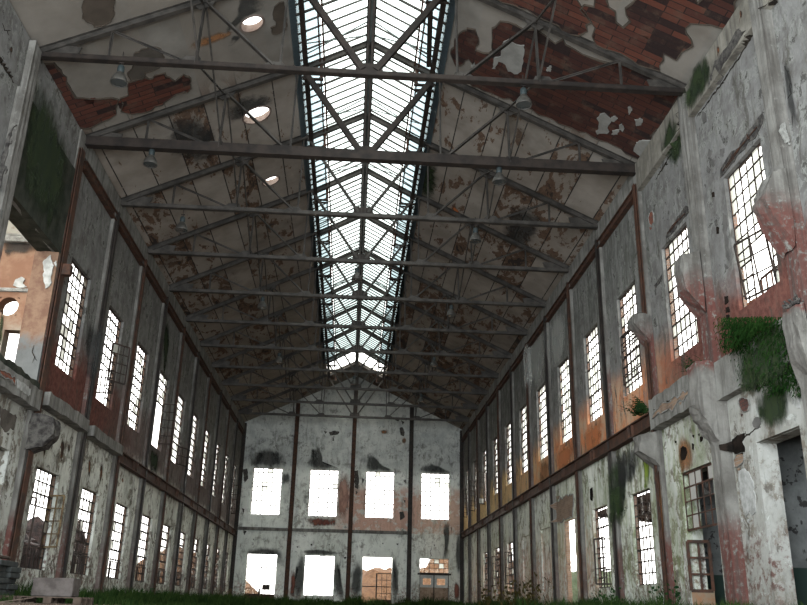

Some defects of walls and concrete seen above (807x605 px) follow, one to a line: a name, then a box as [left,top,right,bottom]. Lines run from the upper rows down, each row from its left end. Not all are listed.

spalling [44,46,192,129]
spalling [450,0,737,159]
spalling [0,369,31,396]
leakage [367,457,390,471]
leakage [424,464,448,473]
leakage [616,450,638,506]
spalling [549,493,574,523]